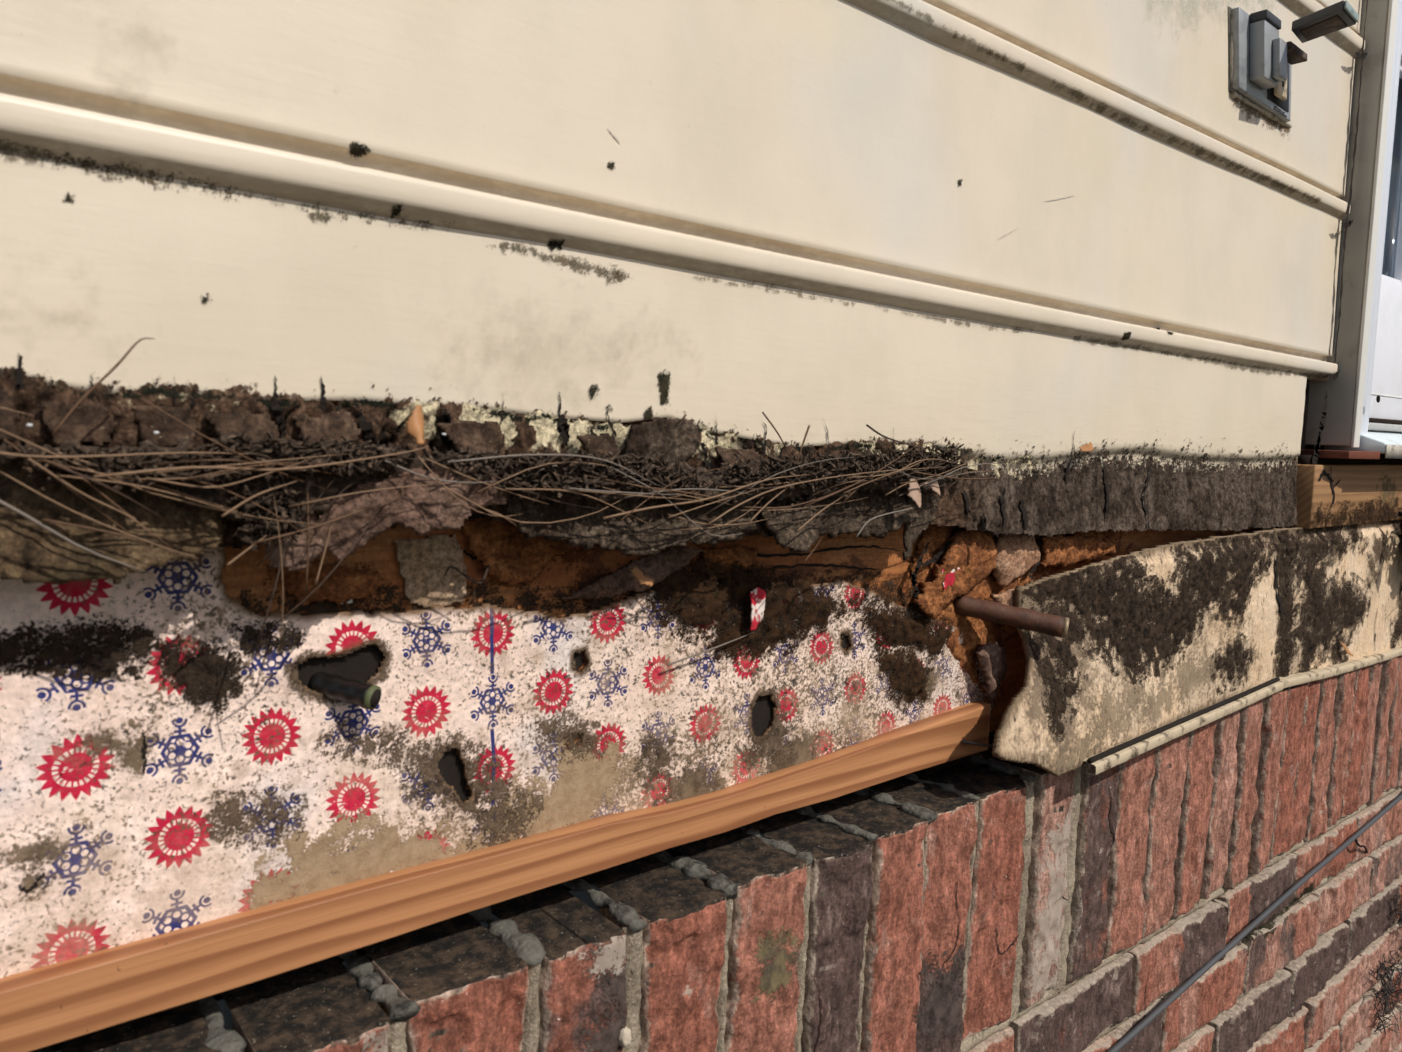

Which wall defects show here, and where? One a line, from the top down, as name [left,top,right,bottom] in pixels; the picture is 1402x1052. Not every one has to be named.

damp [0,139,449,231]
damp [493,241,629,285]
peeling [0,388,19,442]
peeling [577,417,765,472]
peeling [261,420,507,606]
peeling [902,492,939,560]
damp [0,541,915,718]
damp [1013,475,1402,772]
peeling [895,654,943,709]
peeling [656,760,732,806]
peeling [768,729,824,773]
peeling [244,734,643,911]